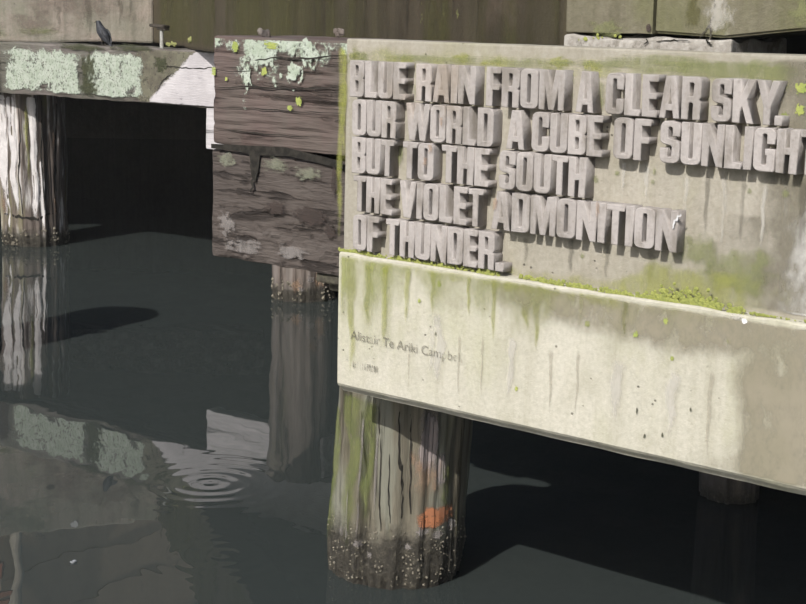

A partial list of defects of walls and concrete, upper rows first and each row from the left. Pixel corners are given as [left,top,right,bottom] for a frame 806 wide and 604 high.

water stain [776,61,806,129]
water stain [751,173,806,316]
water stain [512,285,806,487]